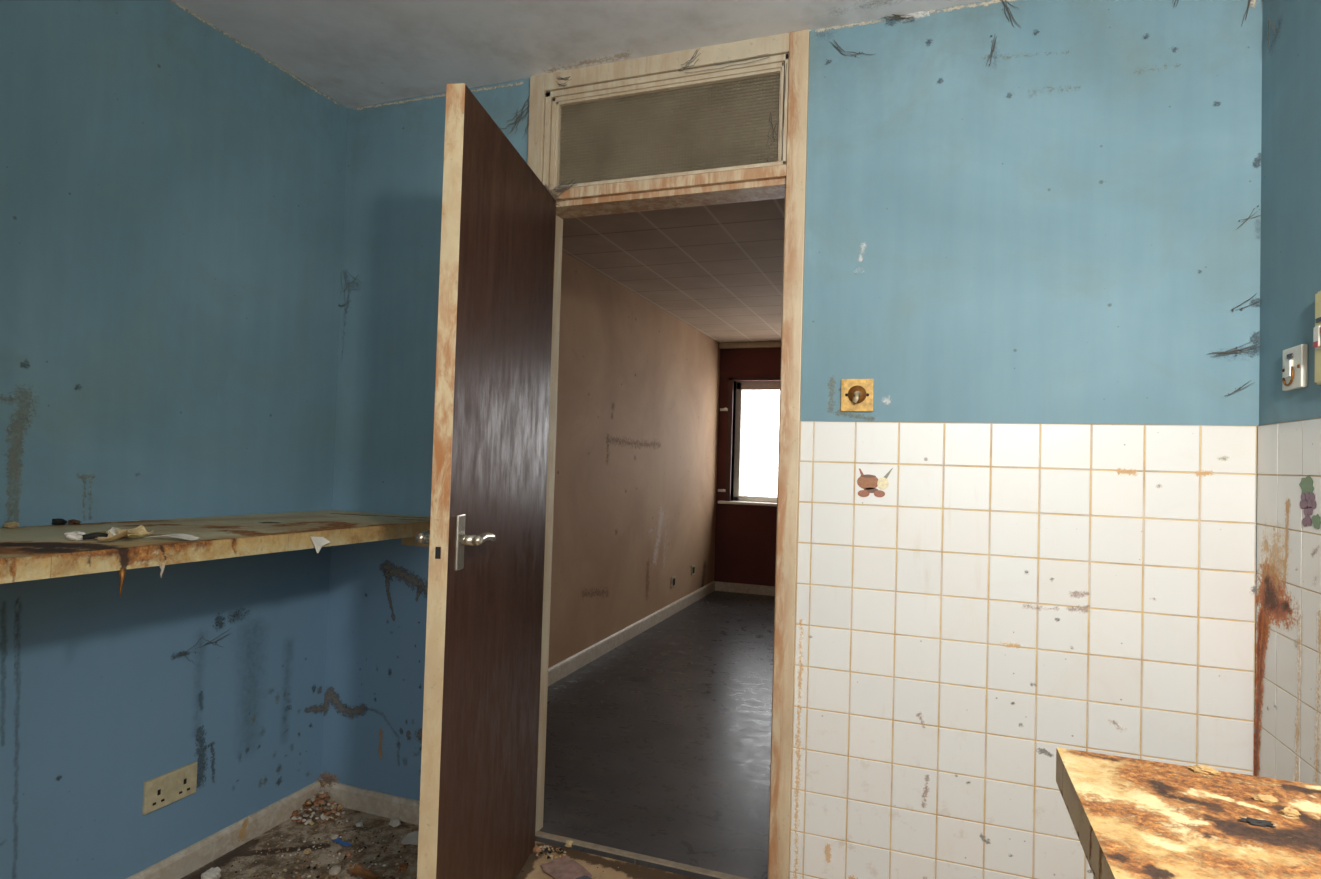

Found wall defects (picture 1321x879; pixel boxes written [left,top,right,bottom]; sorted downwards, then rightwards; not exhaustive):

peeling [814,0,1016,33]
corrosion [1253,534,1299,776]